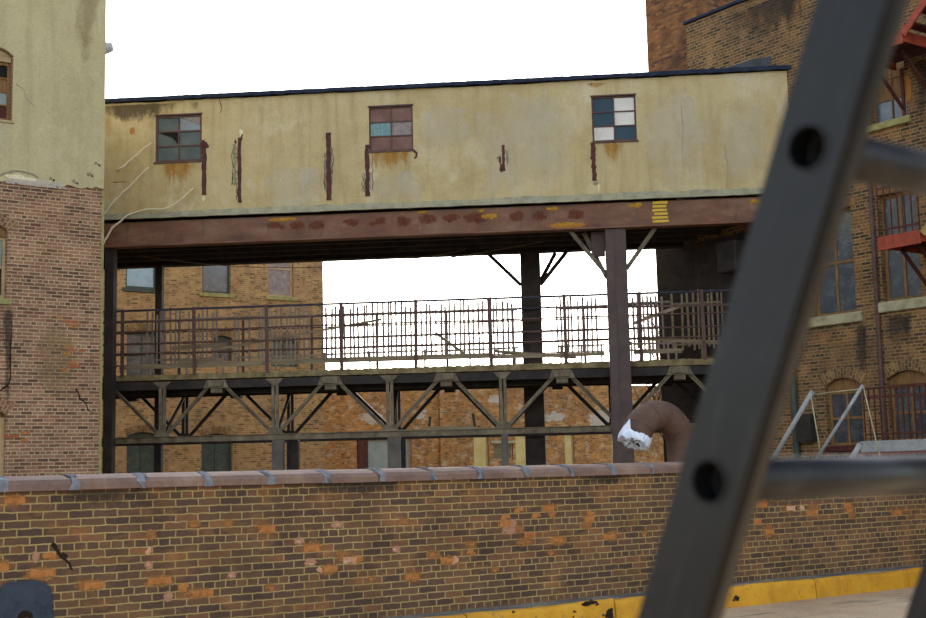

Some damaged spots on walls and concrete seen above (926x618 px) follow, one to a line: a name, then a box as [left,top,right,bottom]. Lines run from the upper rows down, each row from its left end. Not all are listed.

peeling [5,174,79,189]
corrosion [420,213,485,224]
crack [51,542,73,570]